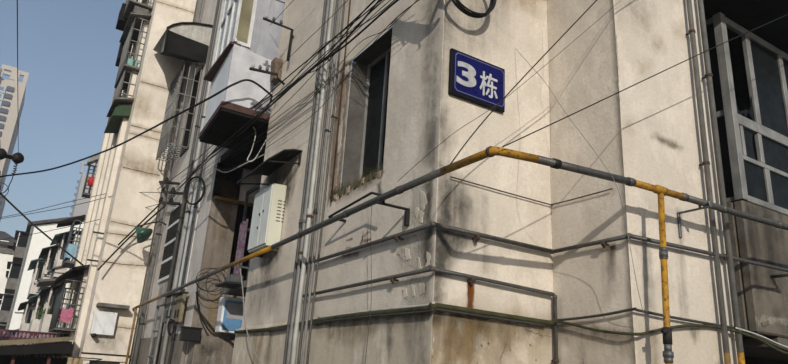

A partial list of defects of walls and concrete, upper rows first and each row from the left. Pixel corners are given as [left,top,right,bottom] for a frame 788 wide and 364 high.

peeling [412,185,431,227]
water stain [424,181,465,268]
peeling [397,239,447,301]